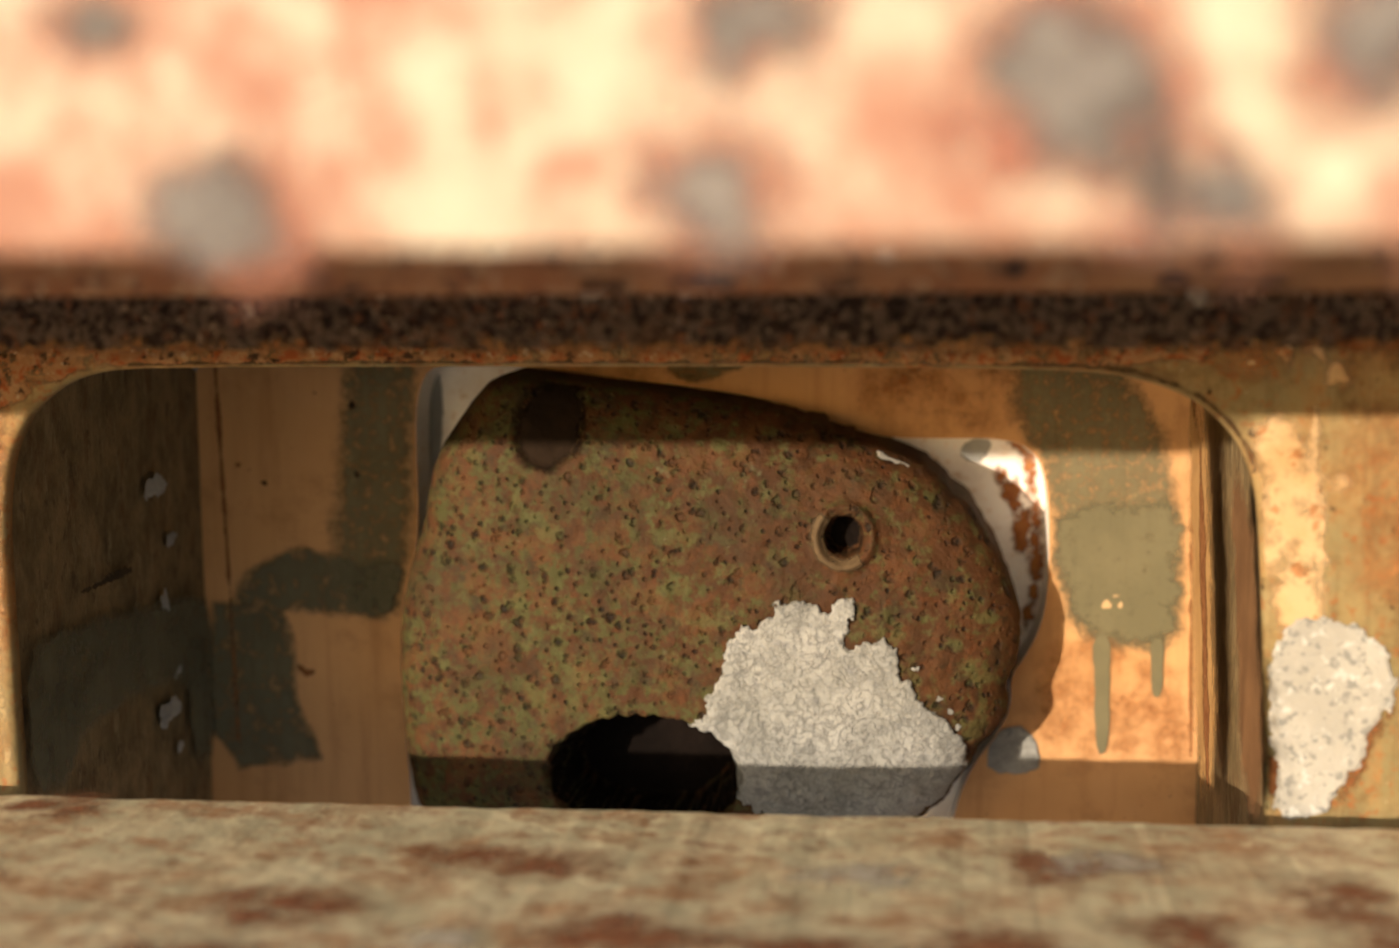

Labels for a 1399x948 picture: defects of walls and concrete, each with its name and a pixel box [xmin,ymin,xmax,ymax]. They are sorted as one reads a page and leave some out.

peeling [961,438,991,462]
rust [0,333,1399,824]
peeling [688,598,968,817]
peeling [987,726,1040,774]